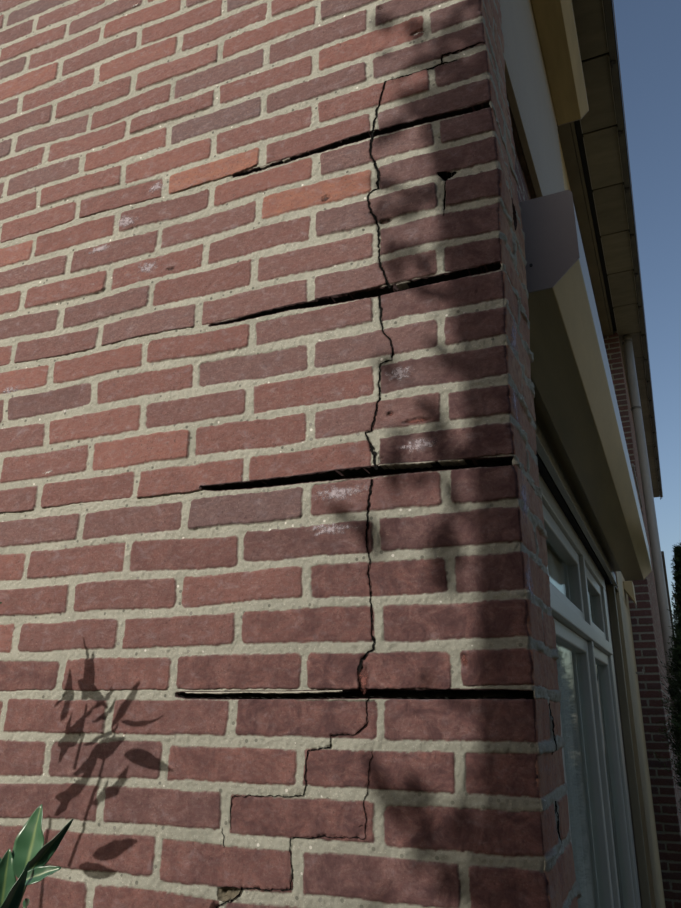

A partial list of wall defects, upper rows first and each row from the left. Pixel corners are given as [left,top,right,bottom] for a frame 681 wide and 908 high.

crack [216,752,373,908]
crack [179,42,557,846]